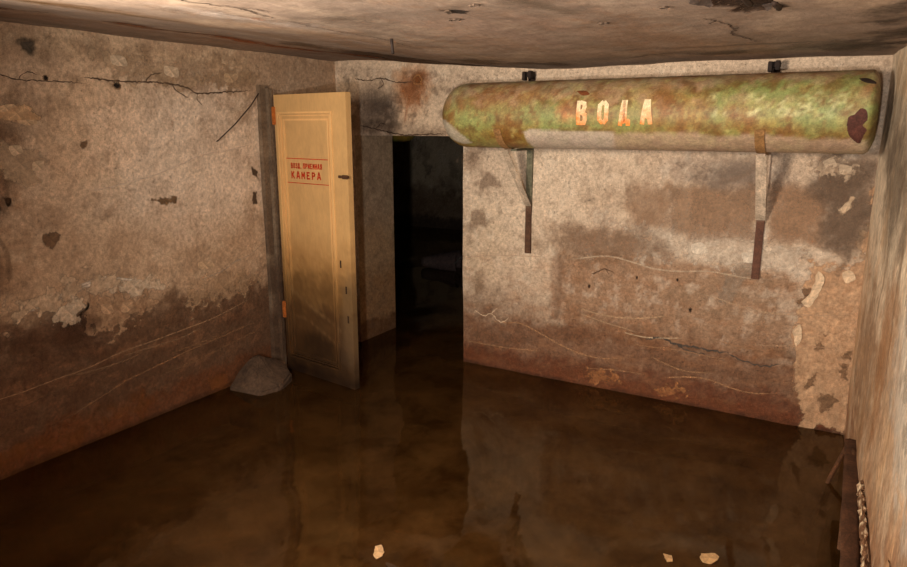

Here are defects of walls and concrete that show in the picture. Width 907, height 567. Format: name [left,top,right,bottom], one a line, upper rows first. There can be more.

spalling [689,0,789,12]
crack [703,18,757,42]
crack [0,71,251,105]
rust [847,108,868,143]
damp [0,261,262,400]
flaking render [791,222,870,433]
rust [586,368,622,385]